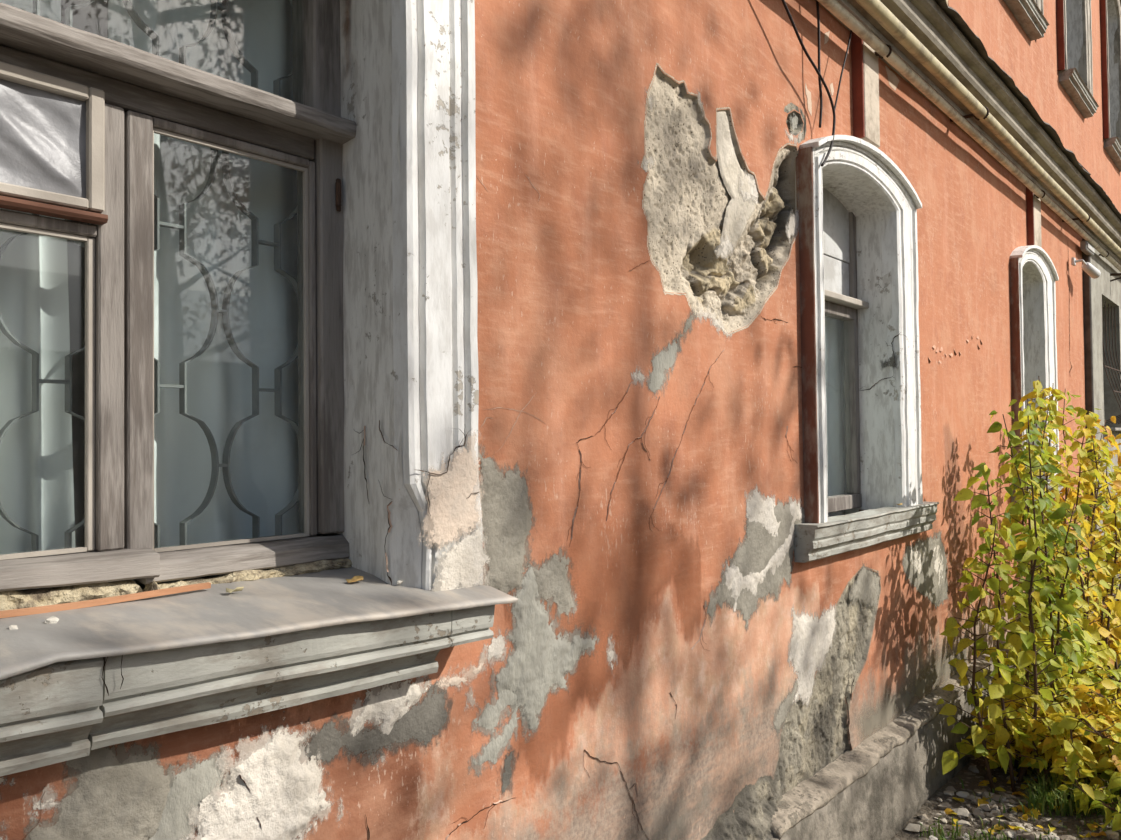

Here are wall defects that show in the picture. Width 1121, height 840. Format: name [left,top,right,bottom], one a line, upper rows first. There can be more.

spalling [641,63,812,337]
crack [354,420,468,585]
spalling [423,433,490,591]
crack [567,350,724,544]
spalling [773,565,881,795]
crack [583,749,649,839]